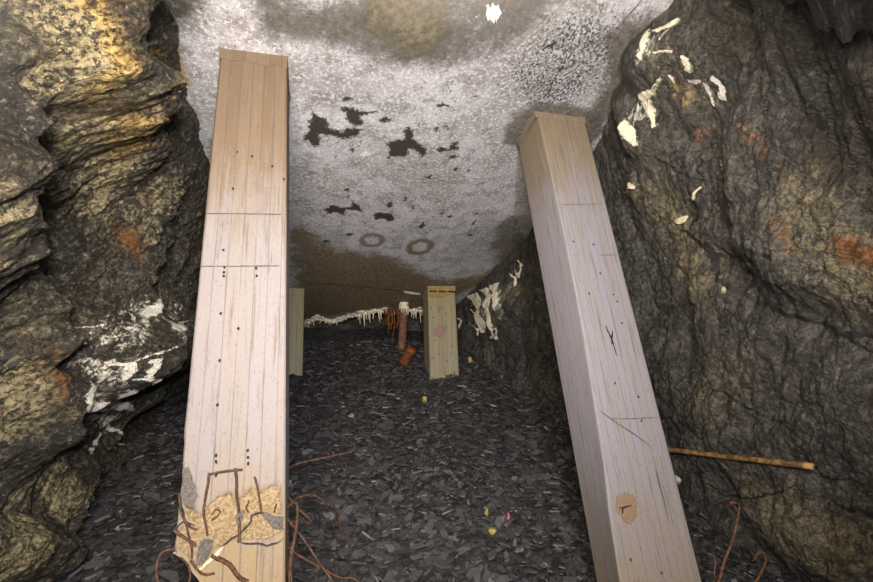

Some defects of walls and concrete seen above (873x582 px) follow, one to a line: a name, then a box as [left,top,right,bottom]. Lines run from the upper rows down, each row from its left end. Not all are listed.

water stain [257,0,553,64]
peeling [303,96,391,153]
peeling [386,125,470,179]
peeling [321,188,414,224]
water stain [290,216,524,340]
rust [382,309,409,338]
spalling [289,442,356,469]
spalling [155,467,359,582]